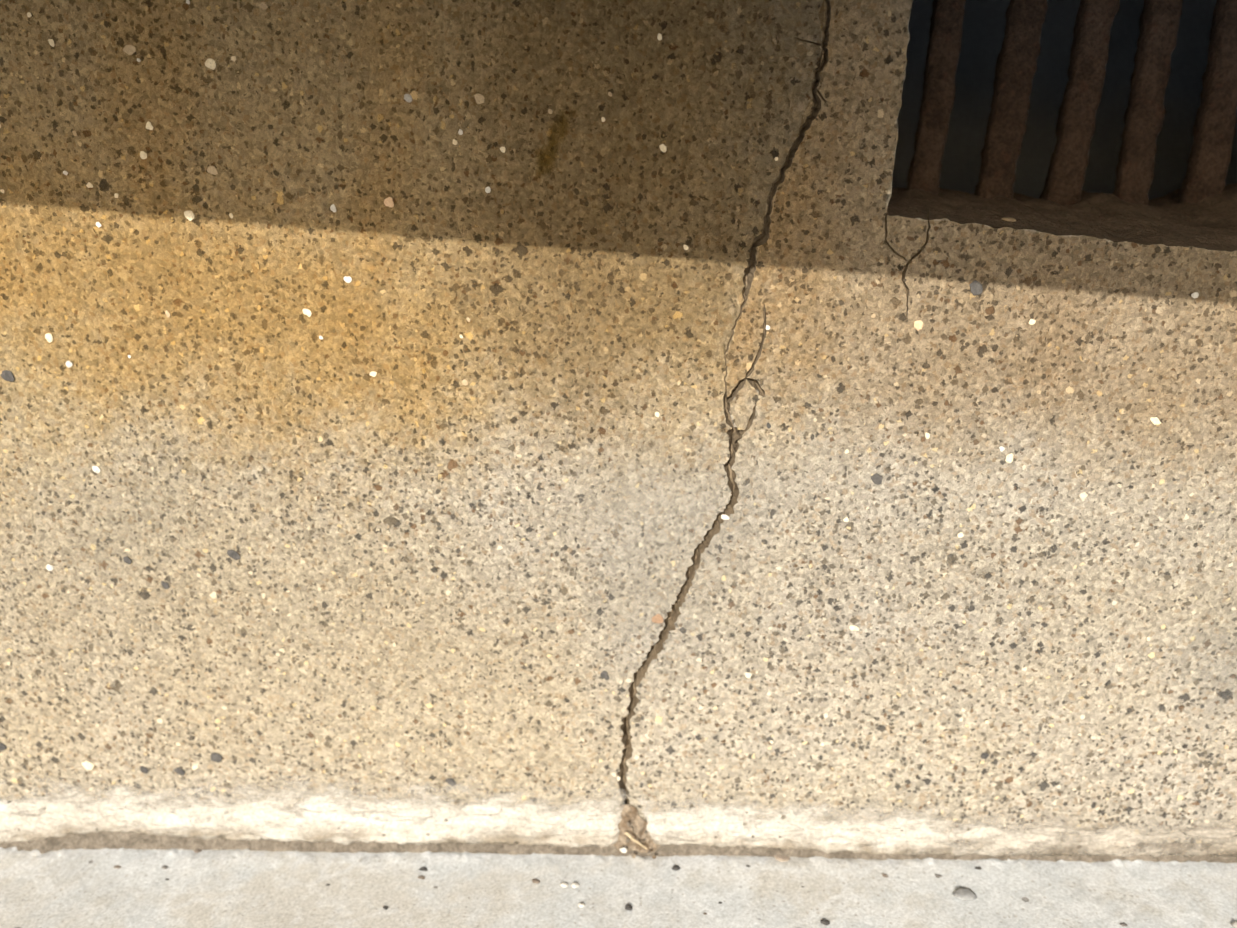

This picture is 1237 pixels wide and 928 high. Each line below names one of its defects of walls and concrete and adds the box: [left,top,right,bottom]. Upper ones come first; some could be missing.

crack [616,0,831,806]